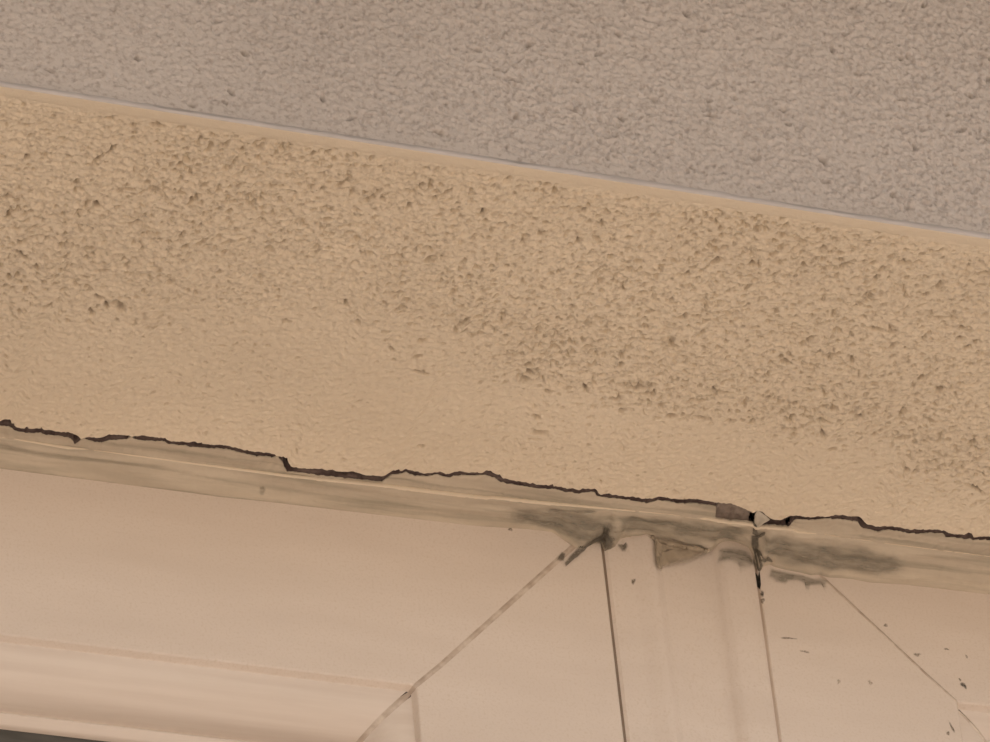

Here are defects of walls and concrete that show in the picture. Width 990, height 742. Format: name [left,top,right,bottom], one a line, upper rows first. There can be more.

crack [0,419,716,505]
flaking render [715,502,786,528]
damp [627,518,753,563]
damp [766,540,896,571]
damp [772,571,824,587]